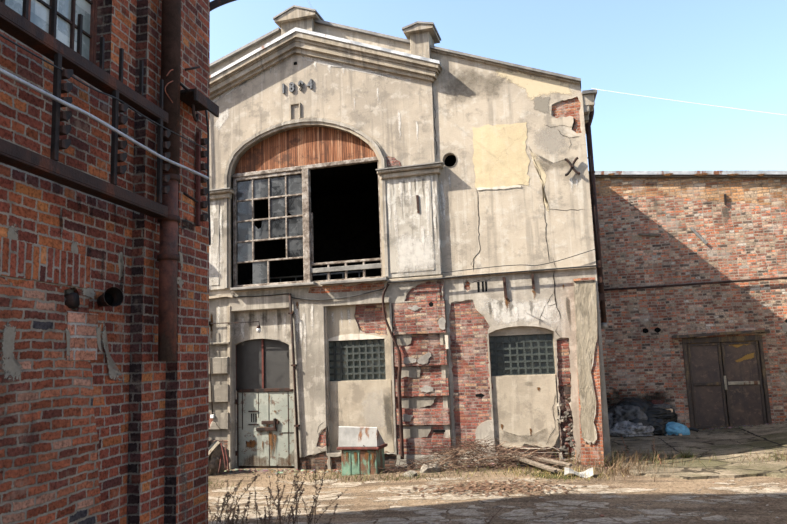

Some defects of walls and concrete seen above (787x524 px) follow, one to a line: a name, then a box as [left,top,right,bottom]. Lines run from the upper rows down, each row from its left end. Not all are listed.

spalling [551,97,582,133]
spalling [308,281,384,294]
crack [462,189,489,282]
crack [539,200,580,335]
corrosion [245,394,294,466]
spalling [354,279,494,468]
spalling [496,326,604,467]